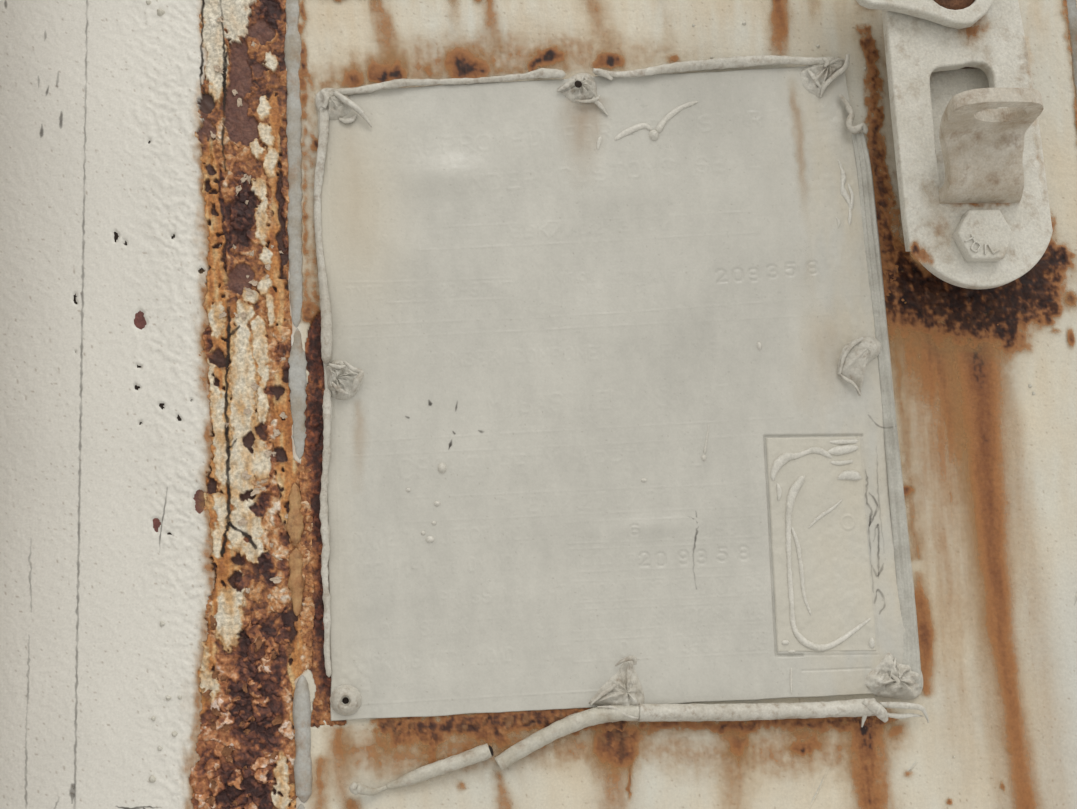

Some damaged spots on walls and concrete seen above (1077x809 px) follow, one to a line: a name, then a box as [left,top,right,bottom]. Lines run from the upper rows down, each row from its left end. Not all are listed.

rust [771,0,789,55]
rust [1062,0,1072,52]
rust [185,0,625,809]
rust [856,25,1077,809]
rust [539,716,904,809]